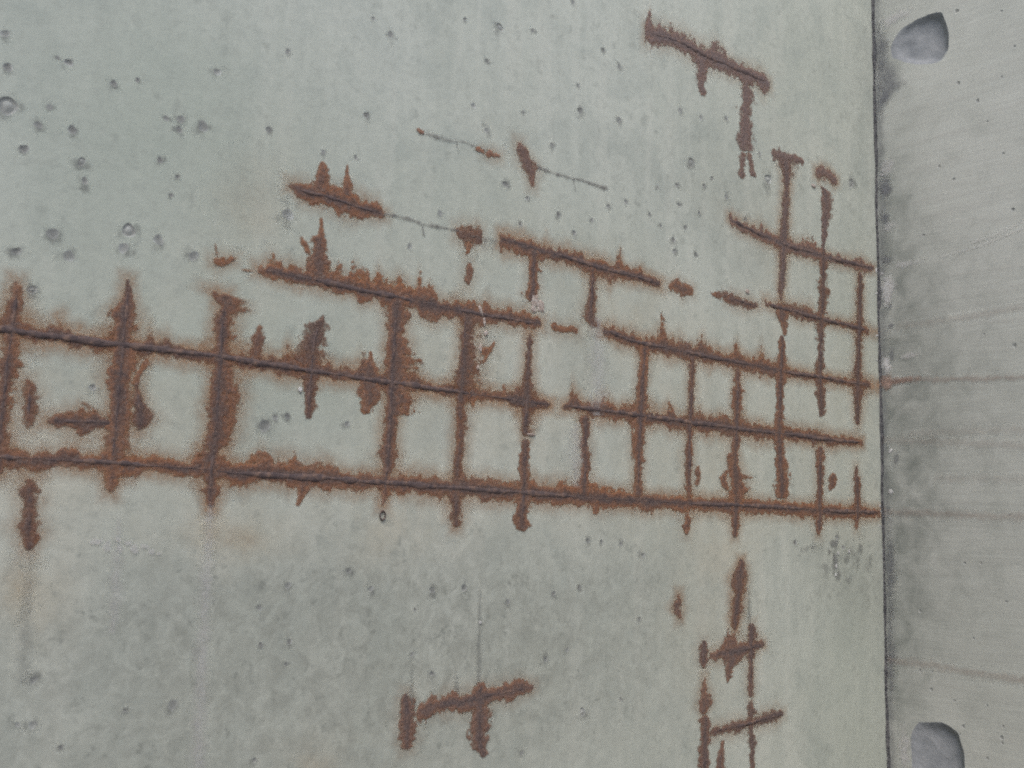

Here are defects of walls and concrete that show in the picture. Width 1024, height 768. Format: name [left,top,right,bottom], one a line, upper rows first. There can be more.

corrosion [645,11,770,178]
crack [539,167,607,190]
corrosion [0,142,912,550]
corrosion [398,678,534,758]
corrosion [697,558,784,768]